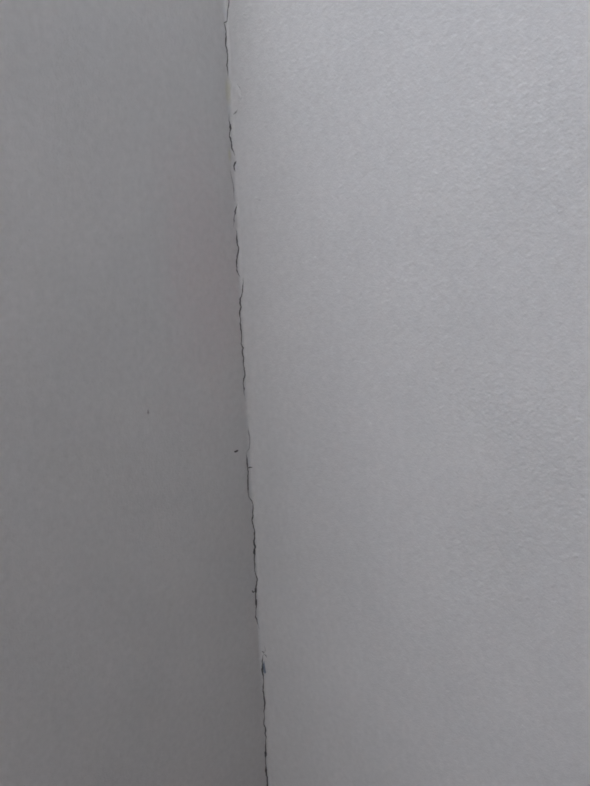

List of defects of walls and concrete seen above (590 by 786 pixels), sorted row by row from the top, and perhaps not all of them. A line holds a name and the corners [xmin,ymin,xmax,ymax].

crack [222,0,230,73]
crack [229,121,246,396]
crack [246,430,259,627]
crack [260,649,268,786]